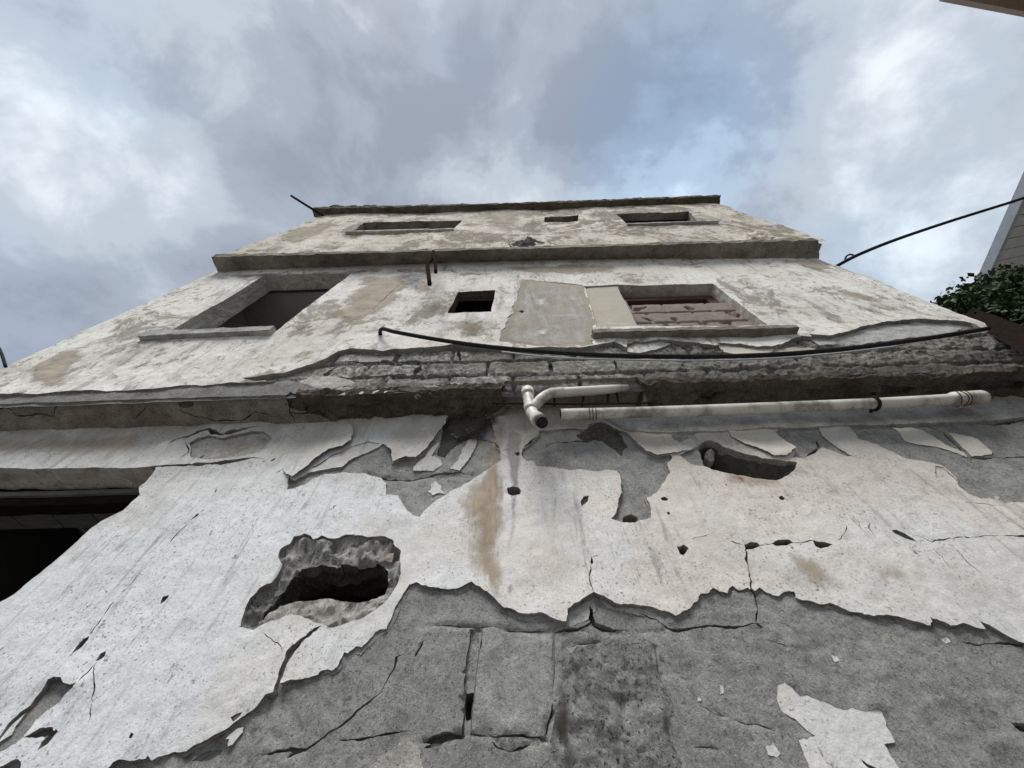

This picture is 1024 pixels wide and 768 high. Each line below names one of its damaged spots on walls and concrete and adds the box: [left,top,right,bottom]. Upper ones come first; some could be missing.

peeling [257,280,1024,523]
crack [30,729,57,746]
peeling [111,584,1024,768]
crack [672,597,756,633]